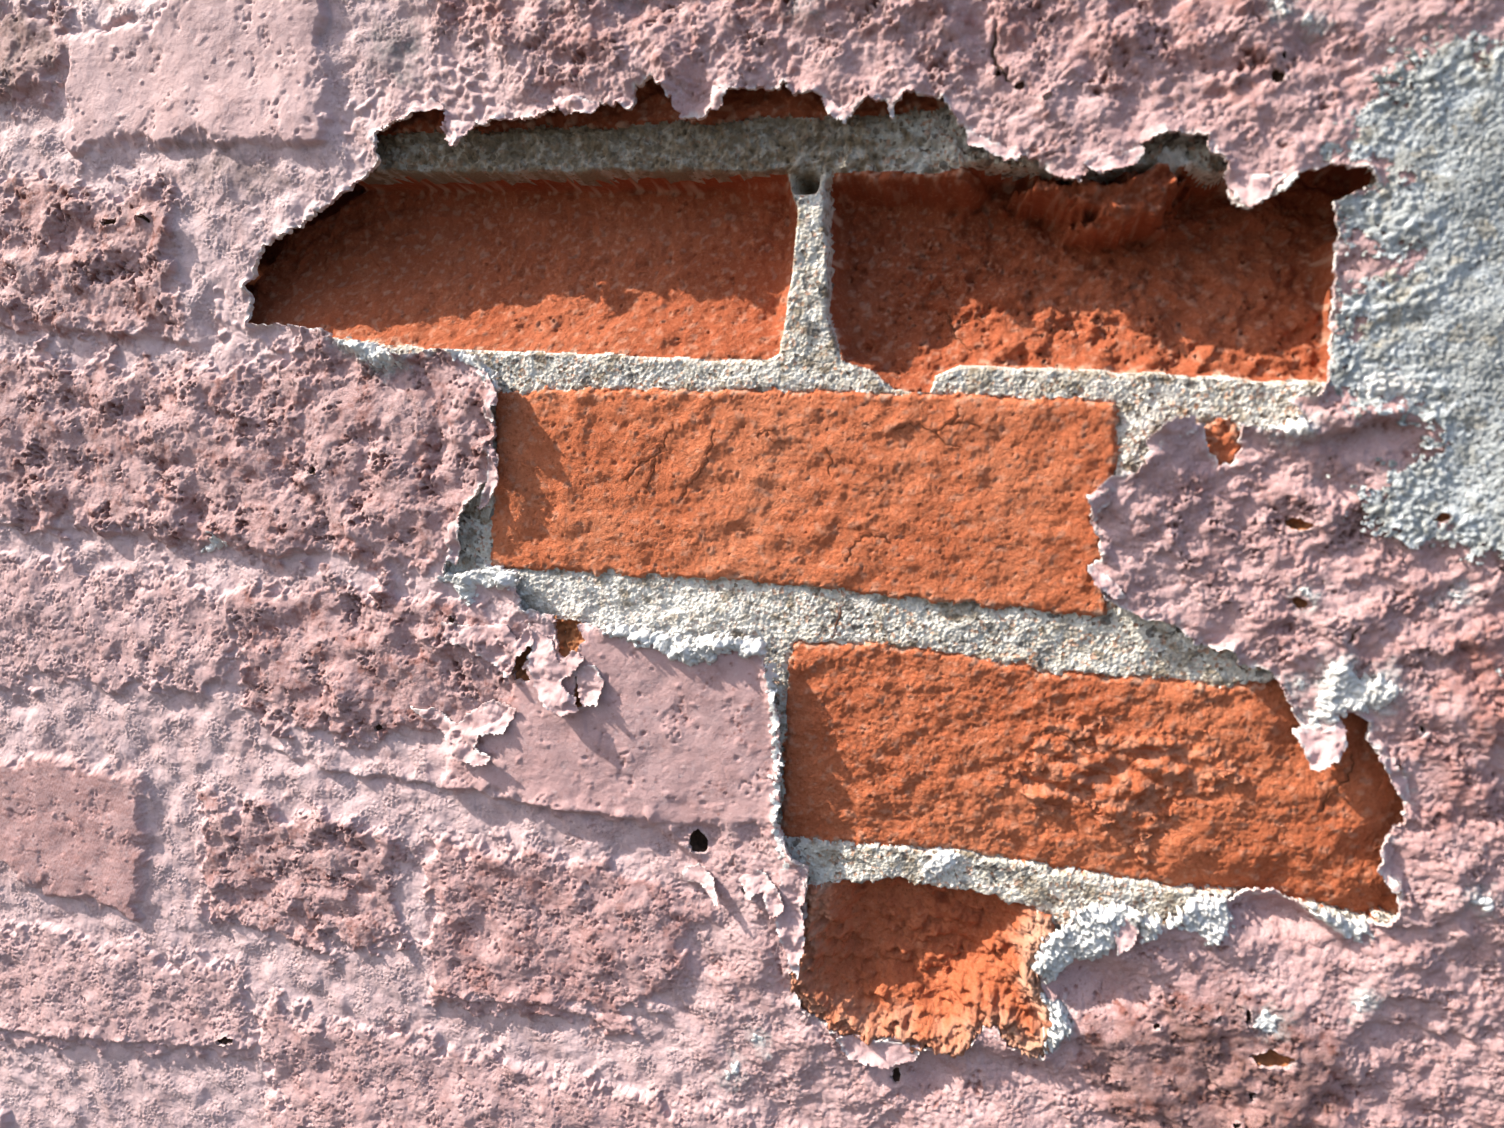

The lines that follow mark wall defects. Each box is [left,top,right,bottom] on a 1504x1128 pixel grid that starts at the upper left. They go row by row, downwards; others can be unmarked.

crack [625,424,715,500]
peeling [1433,512,1450,522]
peeling [248,78,1411,1069]